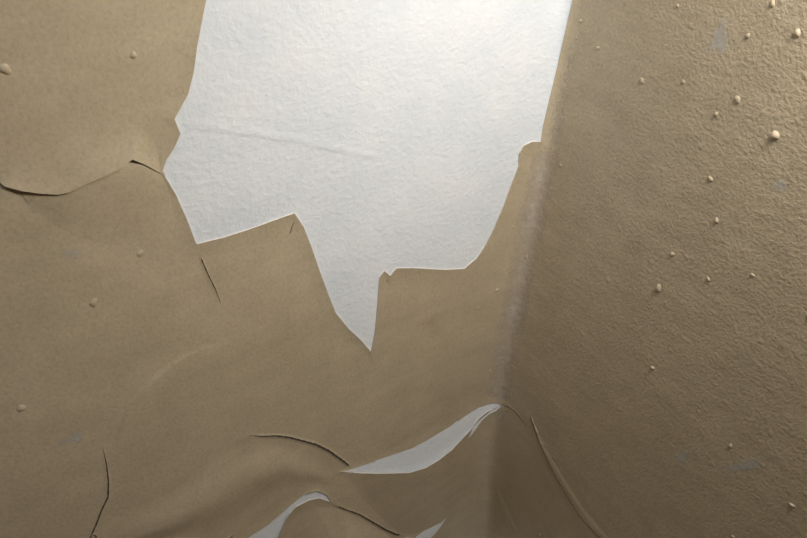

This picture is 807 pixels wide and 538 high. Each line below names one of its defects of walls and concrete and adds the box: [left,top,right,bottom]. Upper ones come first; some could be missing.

peeling [0,0,587,369]
crack [86,446,113,538]
peeling [232,484,350,538]
peeling [334,394,513,538]